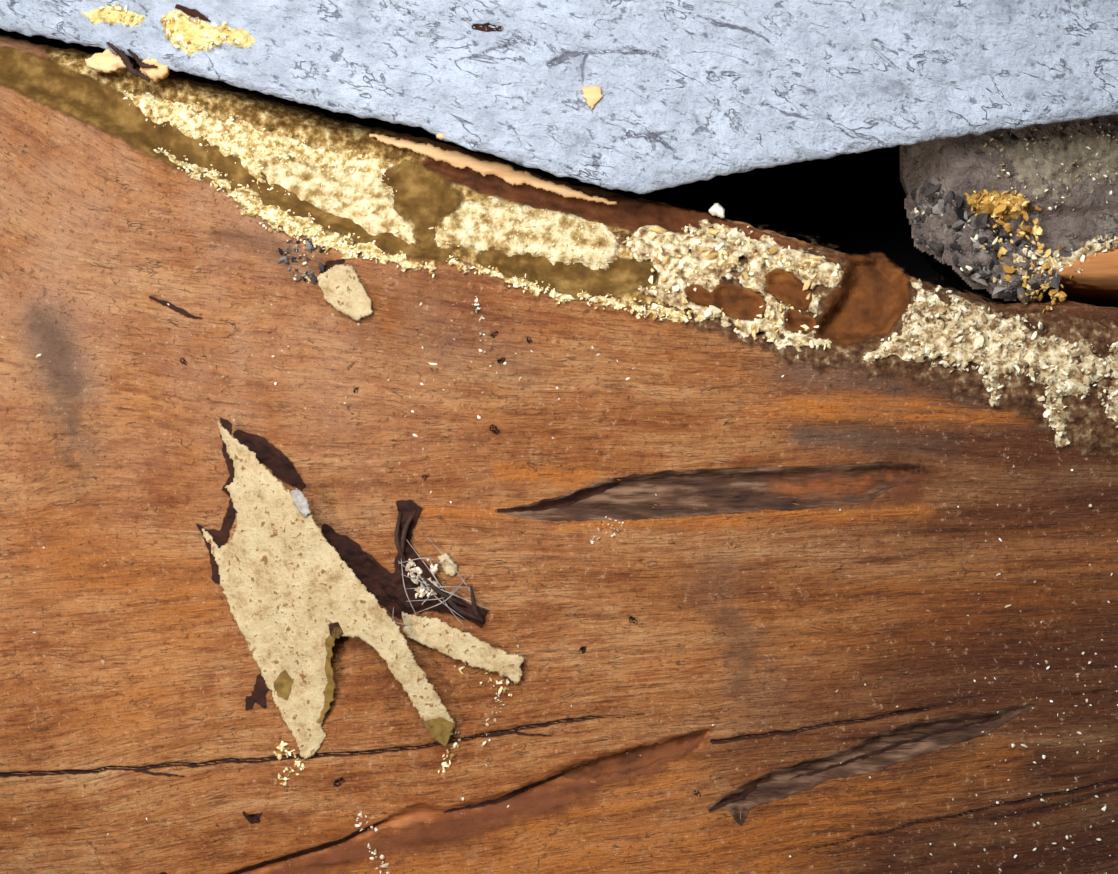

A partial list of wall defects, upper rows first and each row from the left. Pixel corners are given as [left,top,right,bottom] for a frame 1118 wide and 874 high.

peeling [196,417,524,759]
crack [0,713,643,777]
crack [444,762,590,813]